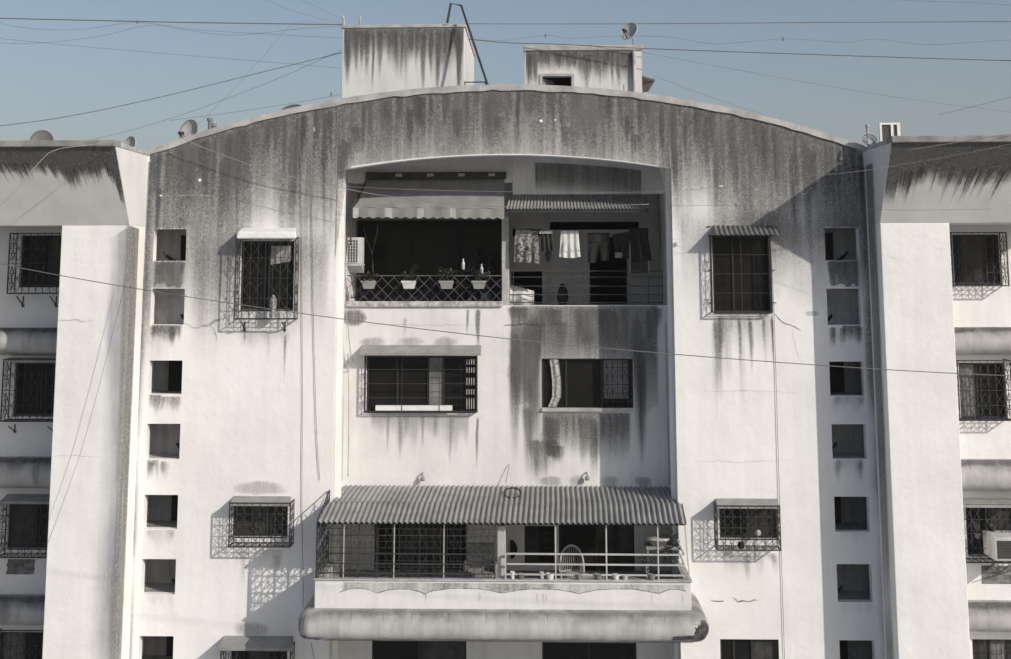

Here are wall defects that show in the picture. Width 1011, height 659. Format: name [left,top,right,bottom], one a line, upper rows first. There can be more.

damp [110,28,887,659]
damp [893,167,1006,198]